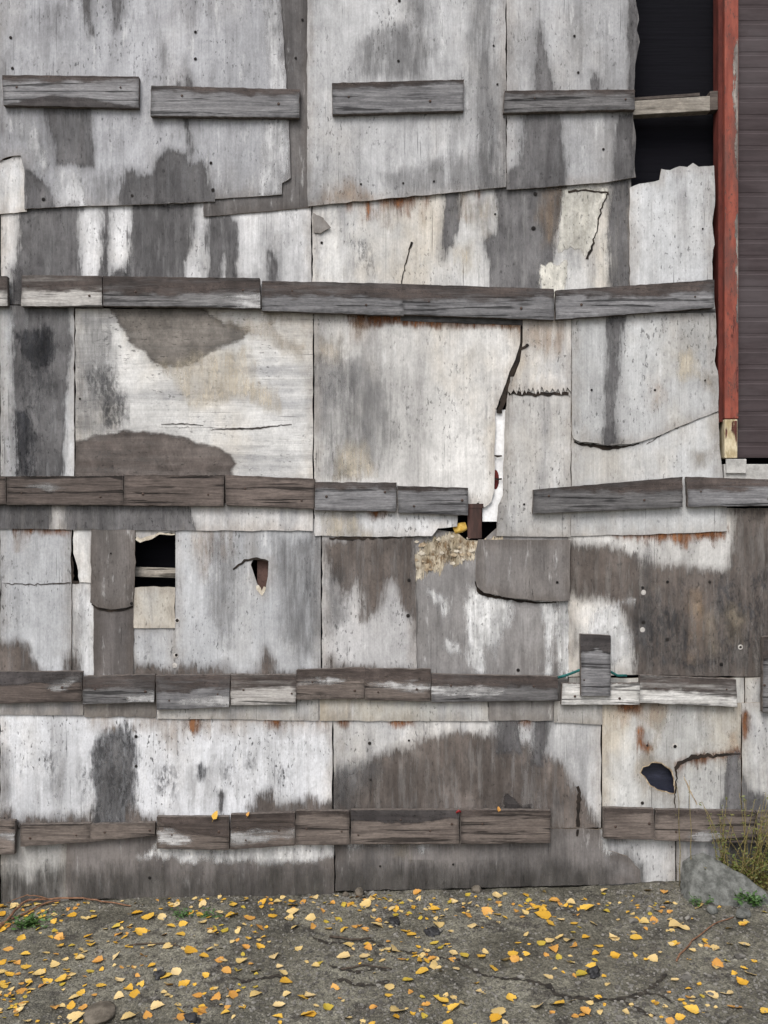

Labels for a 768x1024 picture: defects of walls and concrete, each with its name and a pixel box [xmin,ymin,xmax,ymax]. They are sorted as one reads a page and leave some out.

crack [568,189,609,260]
water stain [0,52,714,476]
crack [401,242,413,284]
crack [497,326,527,413]
crack [161,422,292,430]
spalling [135,532,175,543]
spalling [414,531,503,581]
rust [618,531,725,546]
rust [637,728,651,753]
water stain [0,720,768,837]
spalling [640,761,675,794]
crack [674,748,741,808]